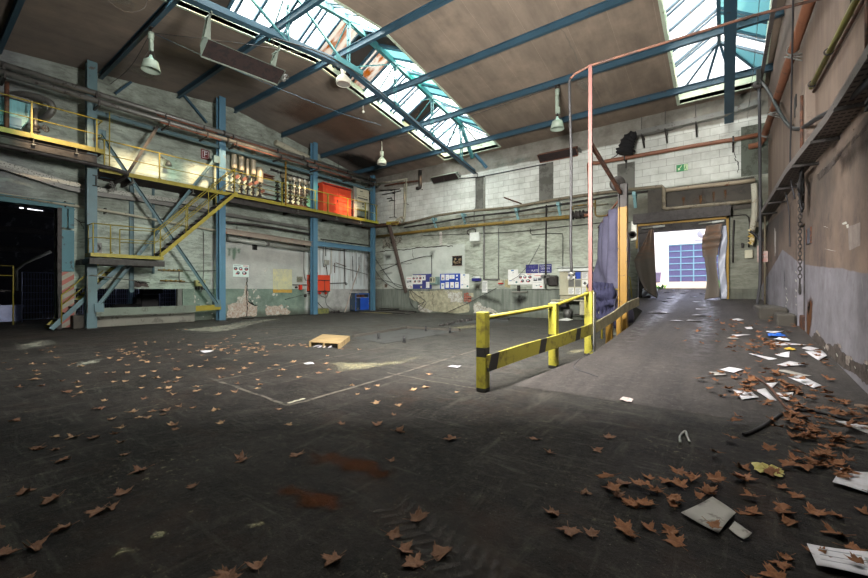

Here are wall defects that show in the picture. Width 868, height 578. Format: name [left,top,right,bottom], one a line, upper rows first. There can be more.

spalling [226,269,292,318]
spalling [409,290,497,314]